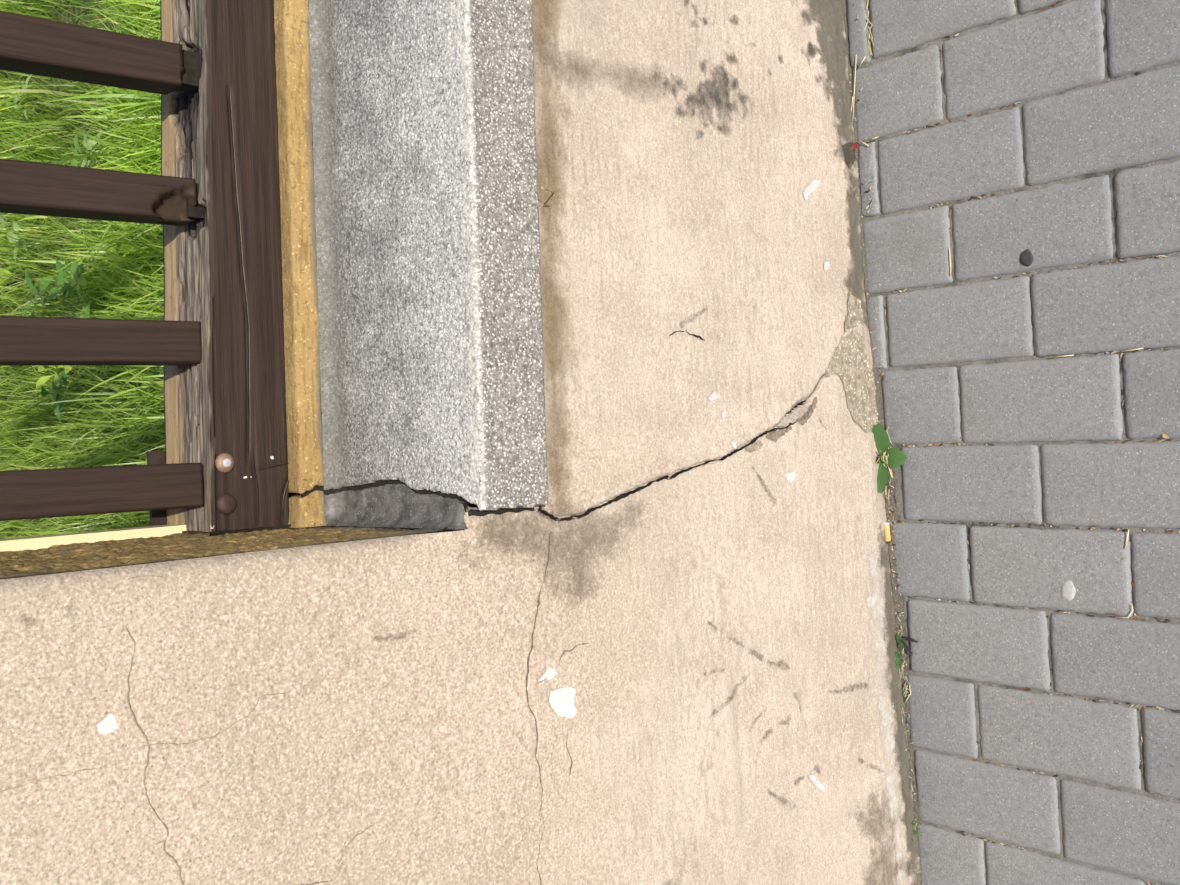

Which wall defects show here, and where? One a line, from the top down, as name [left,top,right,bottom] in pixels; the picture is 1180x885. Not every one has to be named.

damp [679,55,744,130]
crack [253,374,824,885]